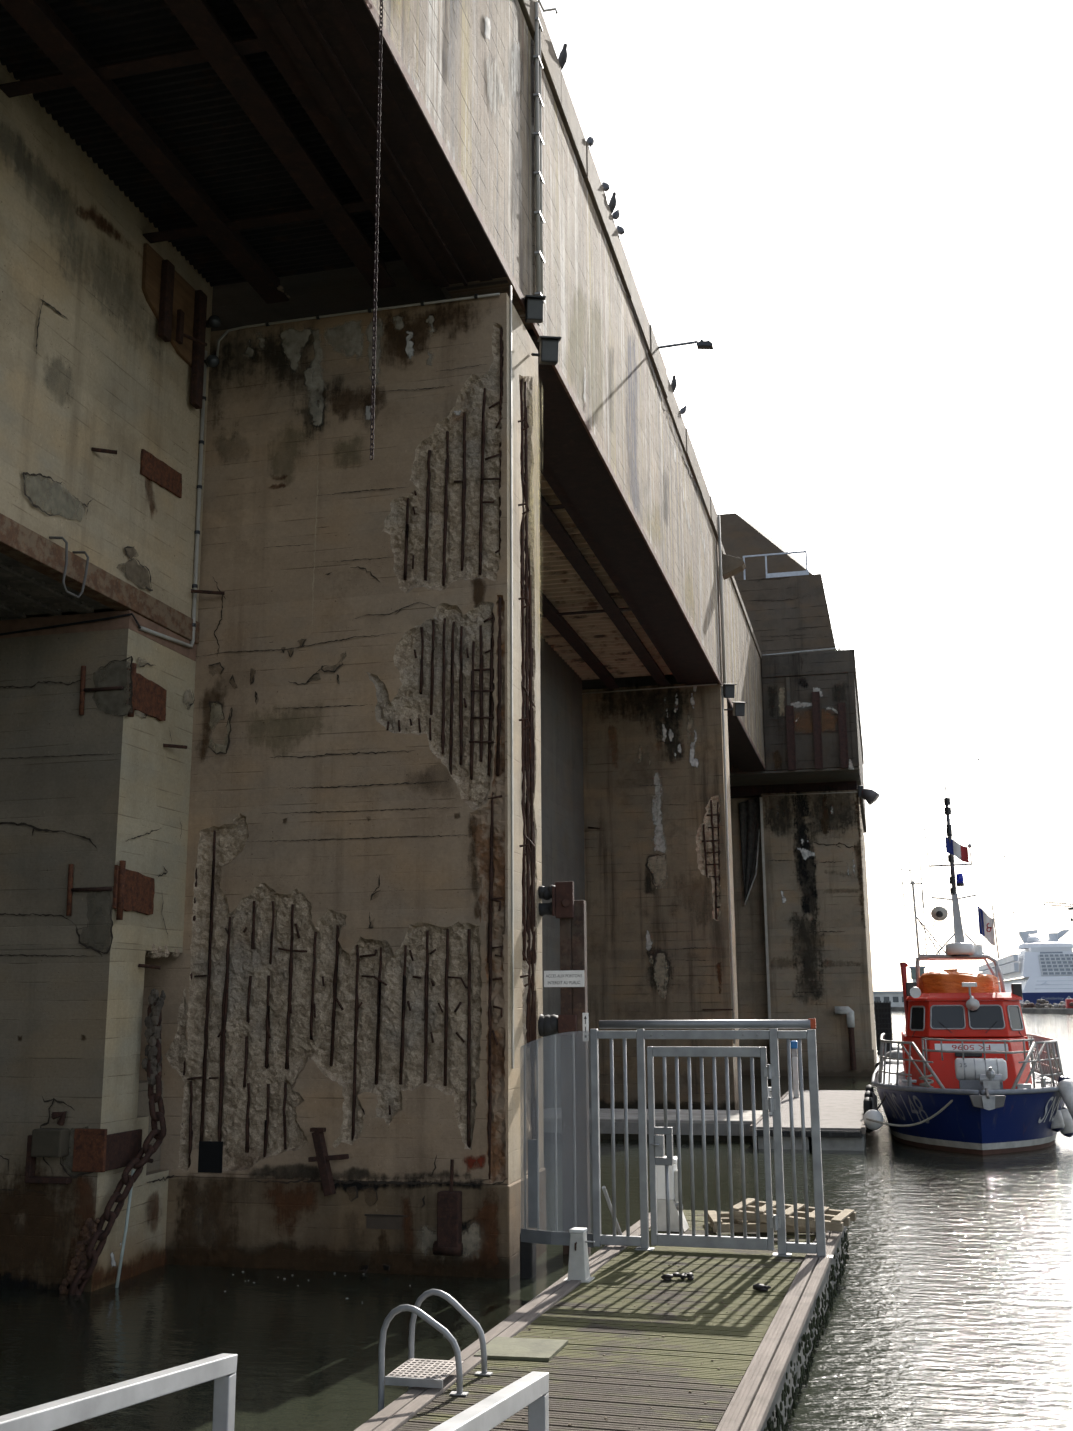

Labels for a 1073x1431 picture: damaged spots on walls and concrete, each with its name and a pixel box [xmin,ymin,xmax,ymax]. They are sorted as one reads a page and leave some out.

corrosion [77,207,128,246]
damp [209,302,473,434]
spalling [145,322,538,1183]
spalling [696,770,733,953]
damp [765,787,856,1001]
corrosion [464,1155,486,1169]
corrosion [69,1177,96,1267]
corrosion [92,1251,167,1291]
corrosion [148,1194,159,1229]
corrosion [462,1200,499,1265]